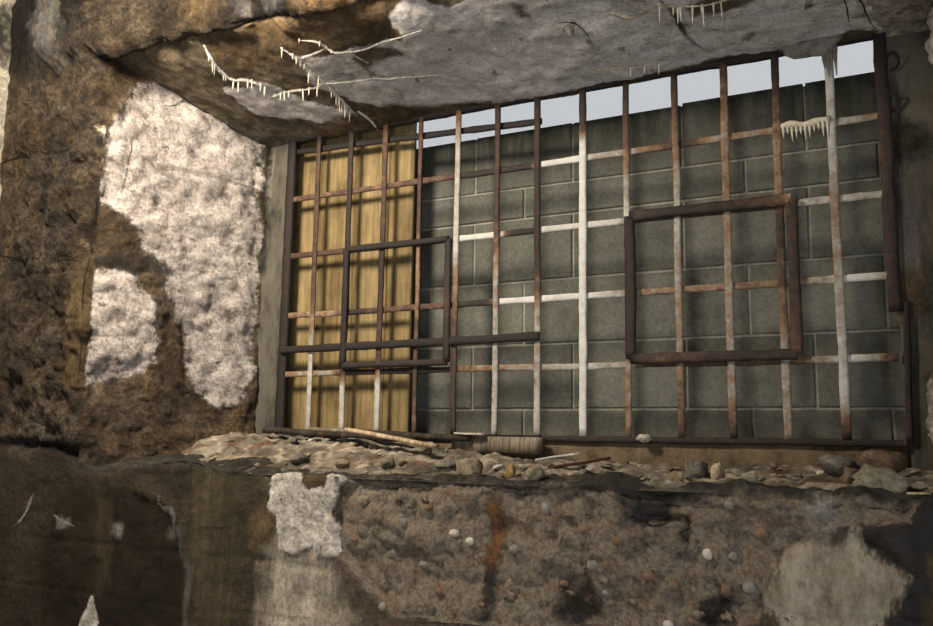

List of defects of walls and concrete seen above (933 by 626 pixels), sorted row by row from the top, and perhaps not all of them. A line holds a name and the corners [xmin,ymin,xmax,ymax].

damp [0,0,53,71]
damp [353,45,404,68]
damp [317,101,519,138]
spalling [223,0,933,124]
damp [629,63,711,84]
damp [687,0,752,17]
spalling [100,81,267,408]
spalling [85,268,159,385]
rust [482,502,509,619]
spalling [267,472,919,626]